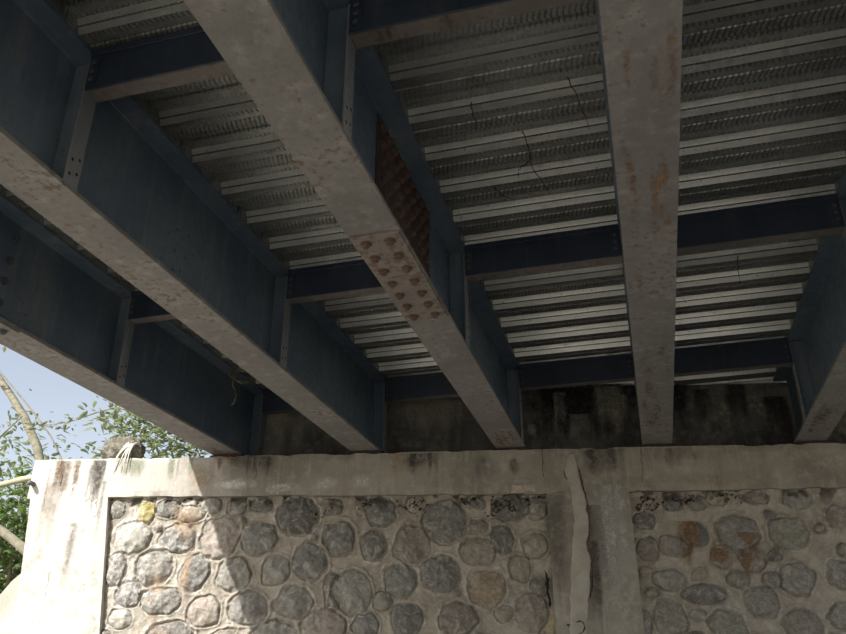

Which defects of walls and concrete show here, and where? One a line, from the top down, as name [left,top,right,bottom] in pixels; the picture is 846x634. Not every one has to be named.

damp [529,383,636,434]
damp [53,461,80,490]
damp [90,460,107,493]
crack [564,468,593,598]
crack [544,570,552,609]